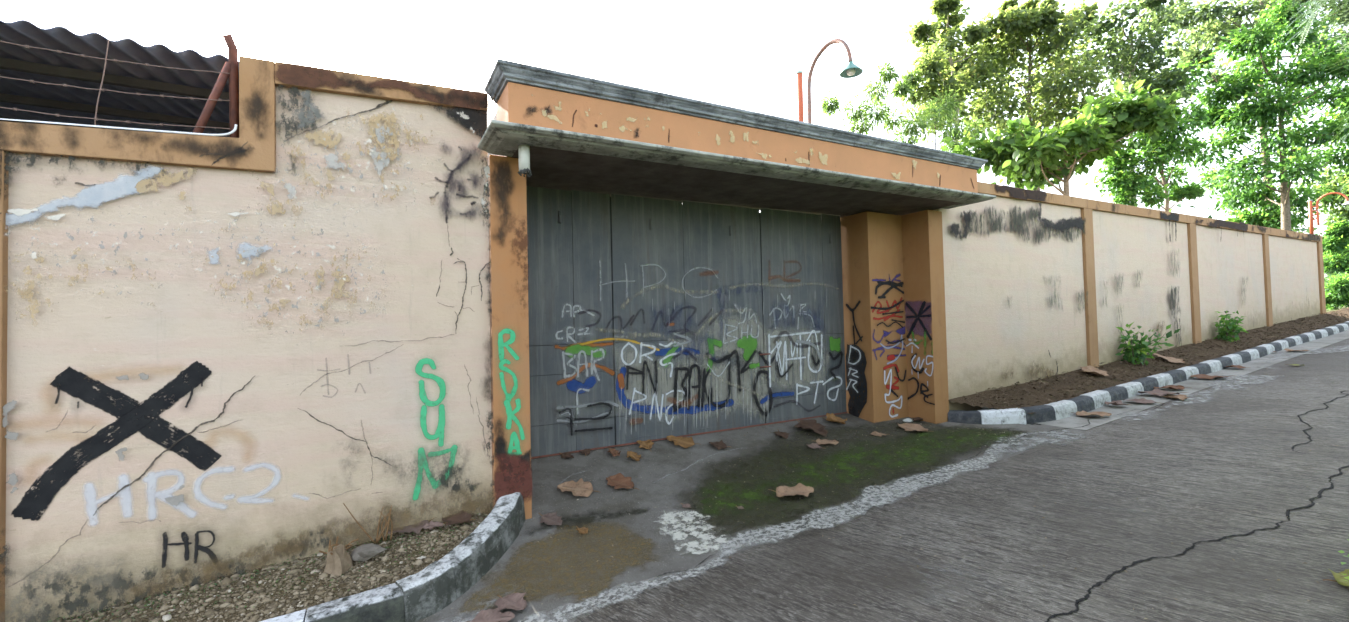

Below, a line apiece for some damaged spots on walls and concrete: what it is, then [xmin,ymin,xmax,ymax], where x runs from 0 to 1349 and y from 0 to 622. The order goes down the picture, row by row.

damp [0,123,114,198]
peeling [6,112,437,332]
damp [950,202,1085,243]
crack [298,146,490,499]
crack [9,376,255,587]
crack [1045,465,1349,622]
crack [1291,391,1349,452]